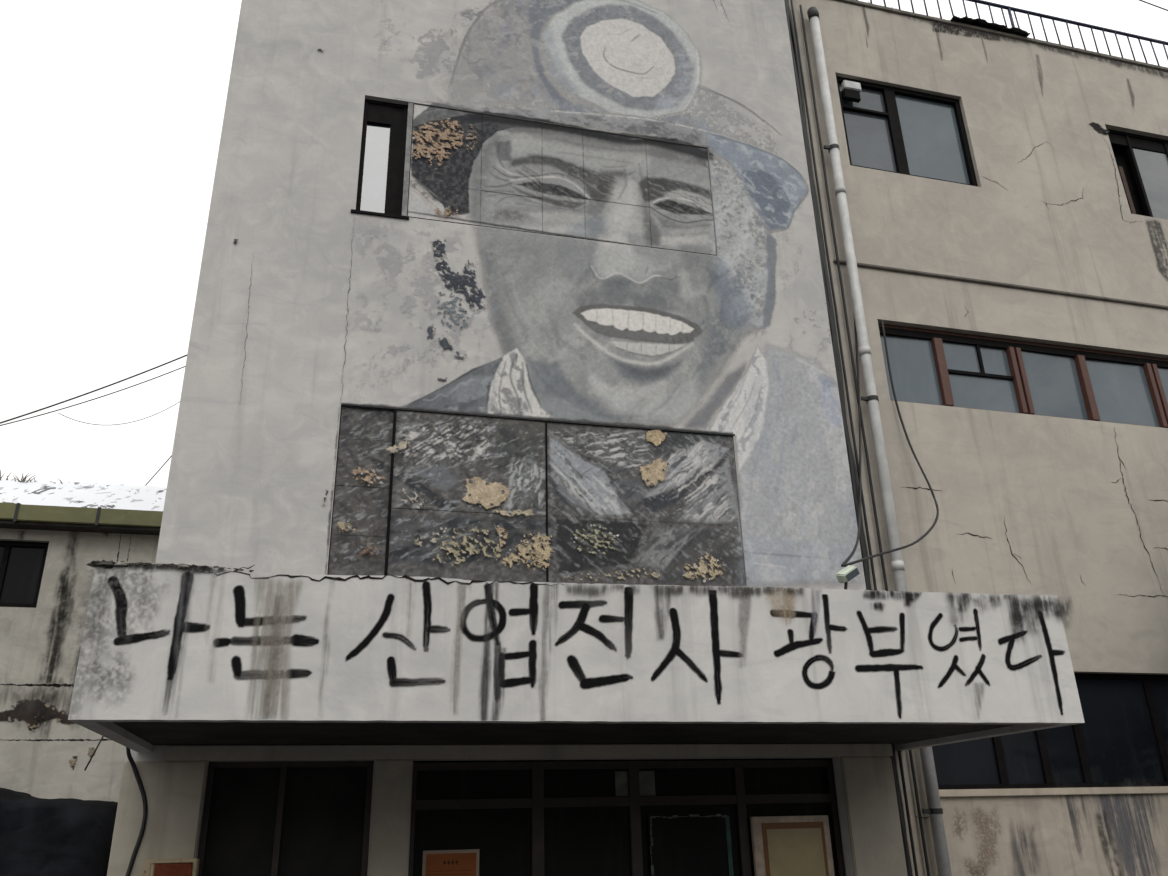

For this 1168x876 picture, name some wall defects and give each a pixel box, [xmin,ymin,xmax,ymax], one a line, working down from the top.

peeling [412,118,477,169]
damp [1147,221,1168,279]
peeling [427,240,485,359]
crack [1112,427,1168,598]
peeling [414,525,554,575]
peeling [683,553,726,582]
damp [35,537,76,725]
damp [990,595,1070,635]
crack [0,681,74,689]
flaking render [0,698,74,731]
crack [0,736,109,744]
damp [1098,794,1155,876]